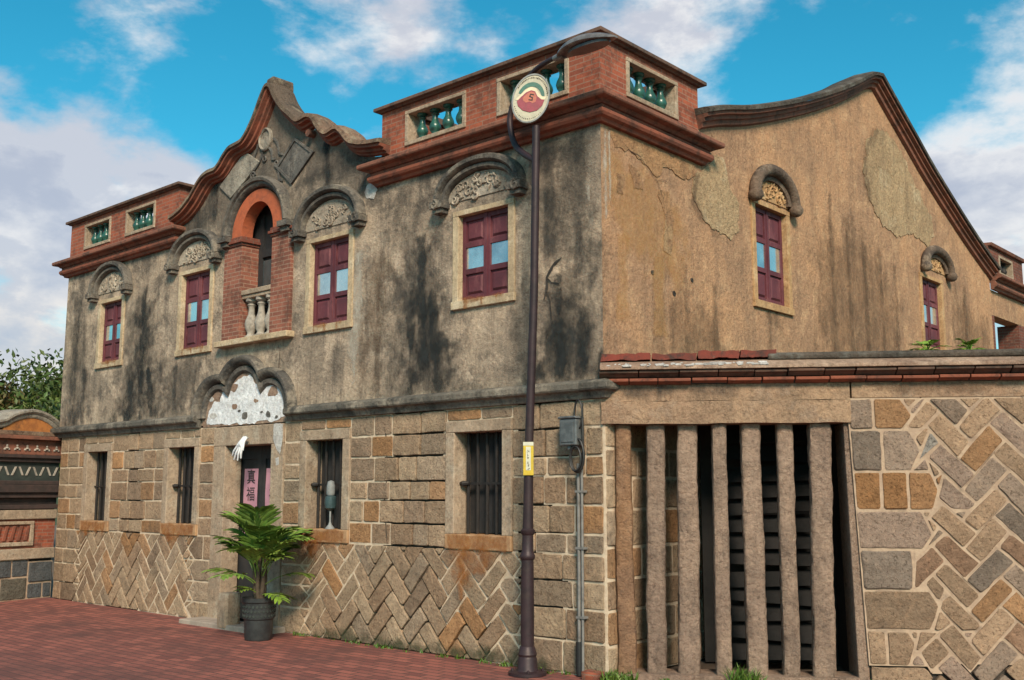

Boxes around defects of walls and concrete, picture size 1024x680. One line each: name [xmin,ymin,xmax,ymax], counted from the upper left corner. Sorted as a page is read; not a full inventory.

spalling [608,129,740,240]
spalling [862,128,934,247]
damp [120,288,156,421]
damp [407,235,455,391]
damp [536,275,602,379]
peeling [207,375,285,465]